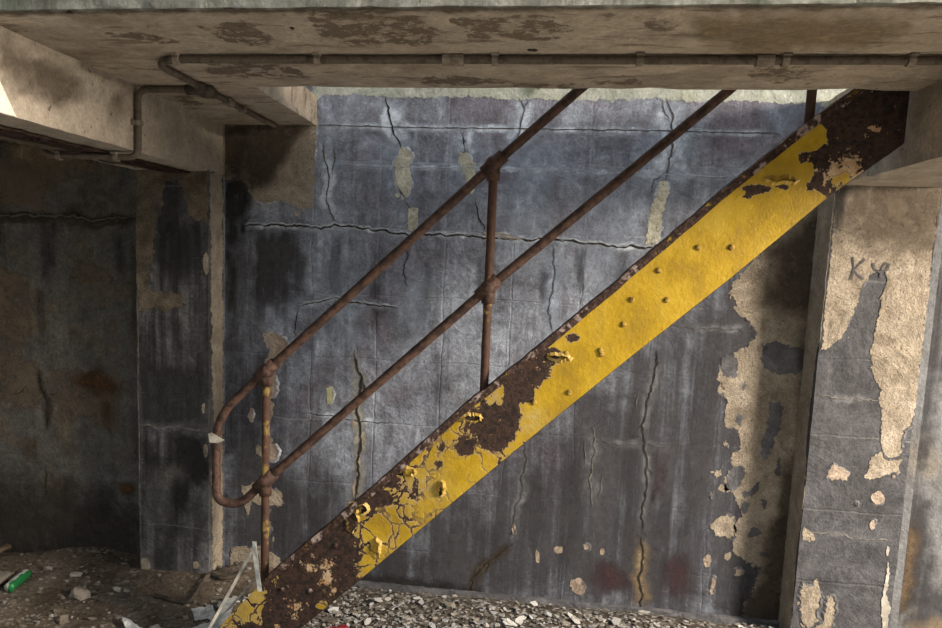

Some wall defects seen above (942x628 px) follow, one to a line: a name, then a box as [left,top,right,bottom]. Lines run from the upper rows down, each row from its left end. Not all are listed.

water stain [198,21,273,46]
water stain [308,12,439,48]
water stain [449,14,573,42]
crack [0,212,136,254]
peeling [392,146,419,231]
crack [243,96,778,336]
peeling [645,181,671,248]
peeling [94,118,326,570]
water stain [225,124,343,562]
crack [302,349,395,500]
crack [584,351,671,607]
peeling [708,185,942,628]